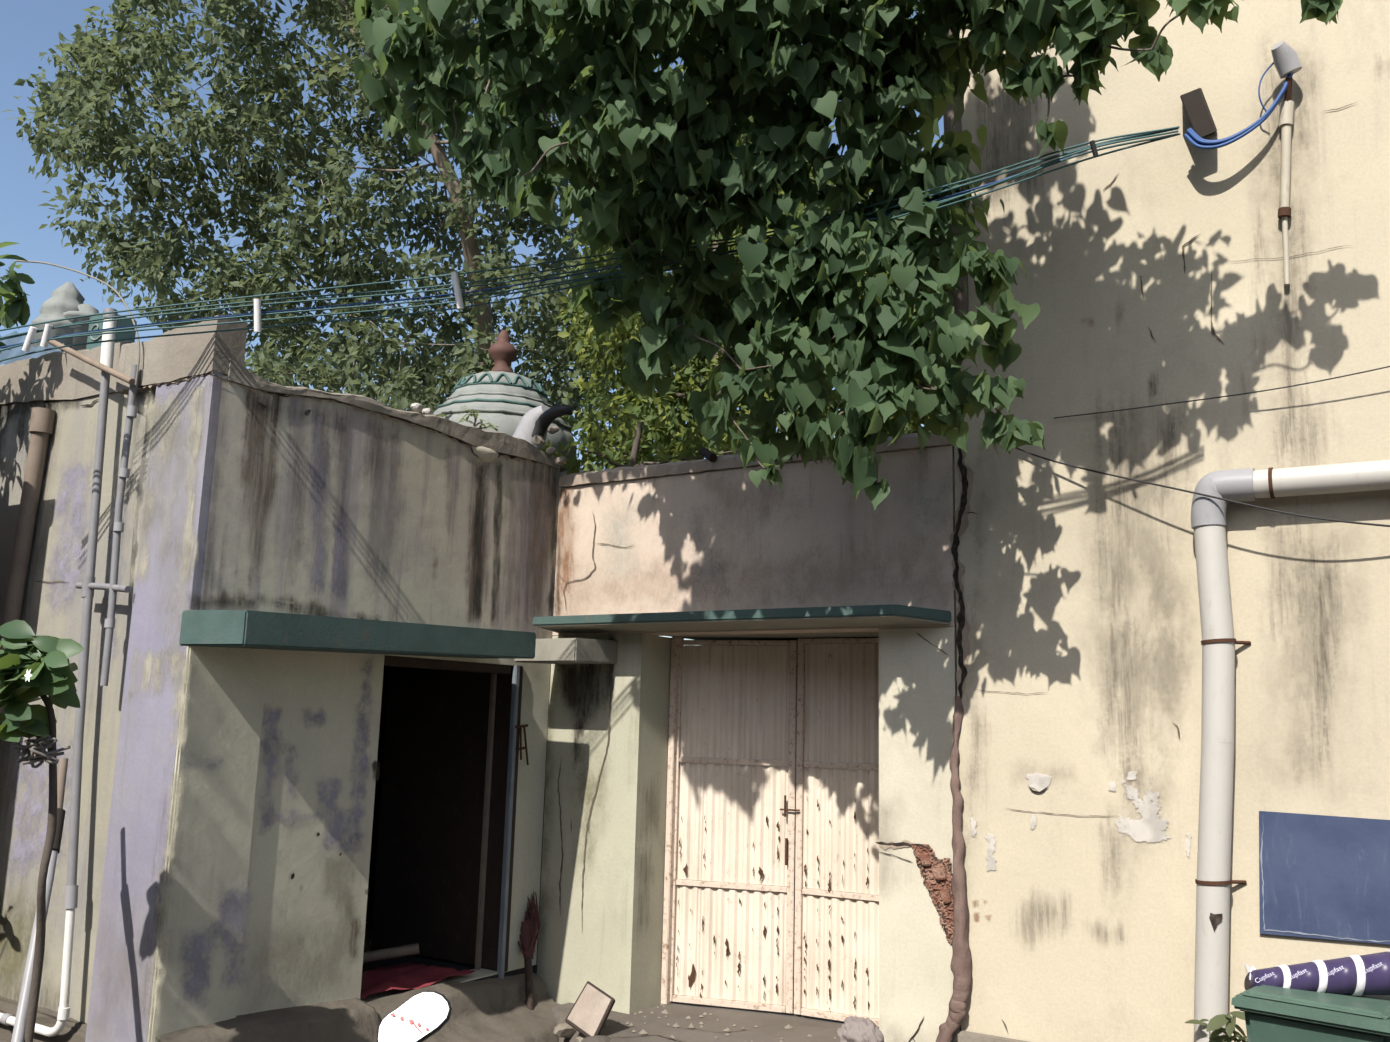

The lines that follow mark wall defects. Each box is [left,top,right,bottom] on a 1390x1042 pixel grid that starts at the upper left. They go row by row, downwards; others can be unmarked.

water stain [243,395,347,616]
water stain [468,464,572,620]
crack [557,514,633,606]
crack [916,448,1044,702]
water stain [559,664,613,759]
crack [557,668,612,910]
peeling [1026,772,1052,793]
peeling [1109,770,1192,858]
corrosion [676,930,703,998]
corrosion [678,900,741,987]
corrosion [803,847,870,1010]
flaking render [912,843,954,944]